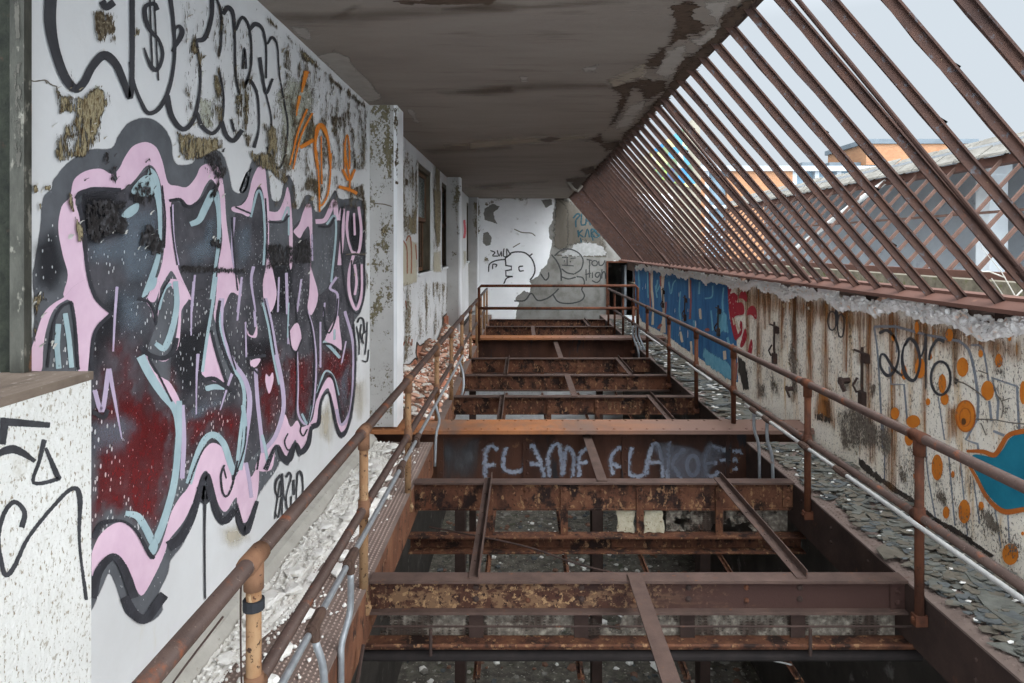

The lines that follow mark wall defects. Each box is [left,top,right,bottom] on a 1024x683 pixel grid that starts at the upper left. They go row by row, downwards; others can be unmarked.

peeling [52,71,166,255]
peeling [173,2,368,240]
peeling [516,198,621,319]
rust [738,288,1018,486]